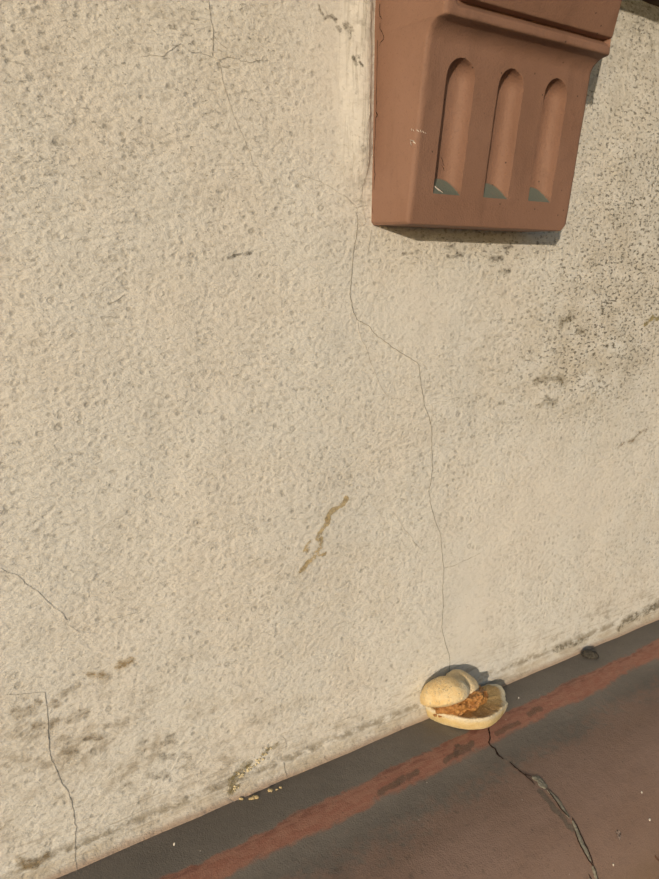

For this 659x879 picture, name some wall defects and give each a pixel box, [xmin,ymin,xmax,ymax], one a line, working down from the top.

crack [147,0,269,160]
crack [365,0,384,52]
crack [301,82,480,668]
leakage [228,743,278,794]
crack [488,728,599,879]